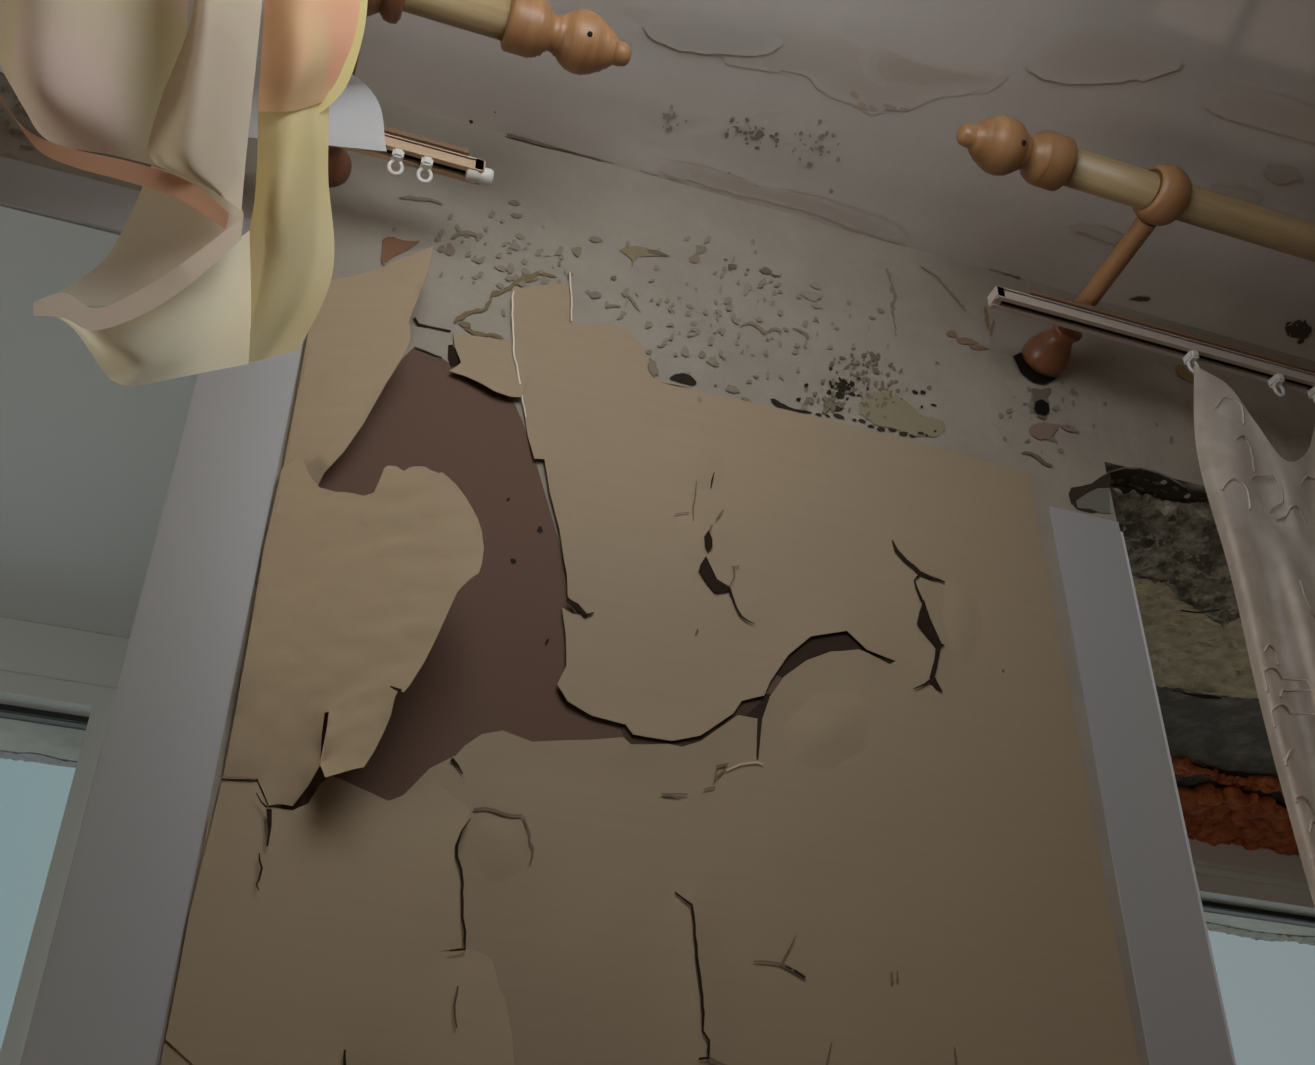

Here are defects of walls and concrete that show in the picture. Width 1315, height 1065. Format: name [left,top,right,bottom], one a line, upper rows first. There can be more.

leakage [725,118,840,167]
peeling [449,333,529,398]
leakage [399,195,603,339]
leakage [586,241,945,437]
peeling [165,247,514,1065]
crack [567,598,594,617]
crack [675,472,755,624]
crack [619,631,895,797]
crack [892,540,945,692]
spalling [1069,467,1258,699]
crack [675,892,727,1065]